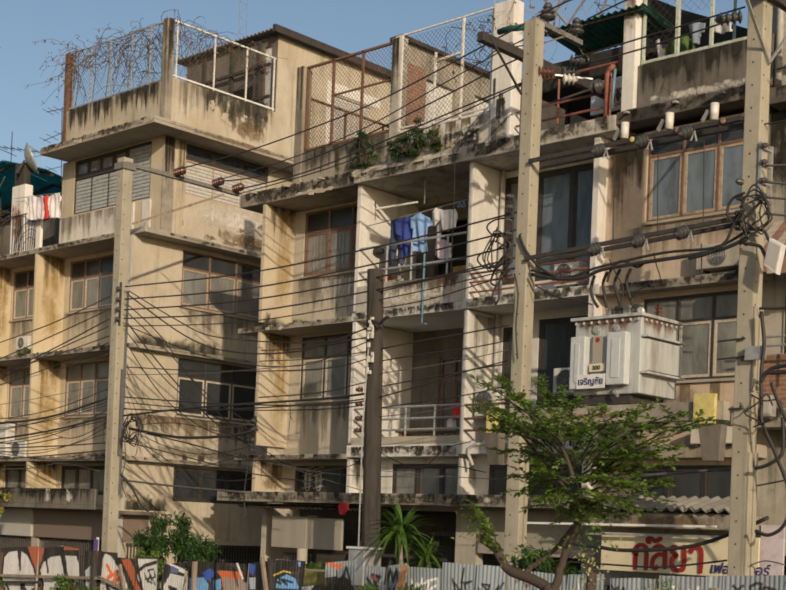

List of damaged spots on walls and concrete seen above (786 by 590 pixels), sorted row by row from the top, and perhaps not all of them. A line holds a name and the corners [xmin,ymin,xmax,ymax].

leakage [642,39,747,115]
leakage [43,81,159,152]
leakage [195,87,272,154]
mould [540,116,608,143]
leakage [246,78,520,230]
leakage [610,133,644,197]
leakage [202,207,262,254]
leakage [39,238,92,274]
leakage [242,316,321,357]
leakage [1,345,110,378]
leakage [0,487,89,502]
leakage [381,493,506,506]